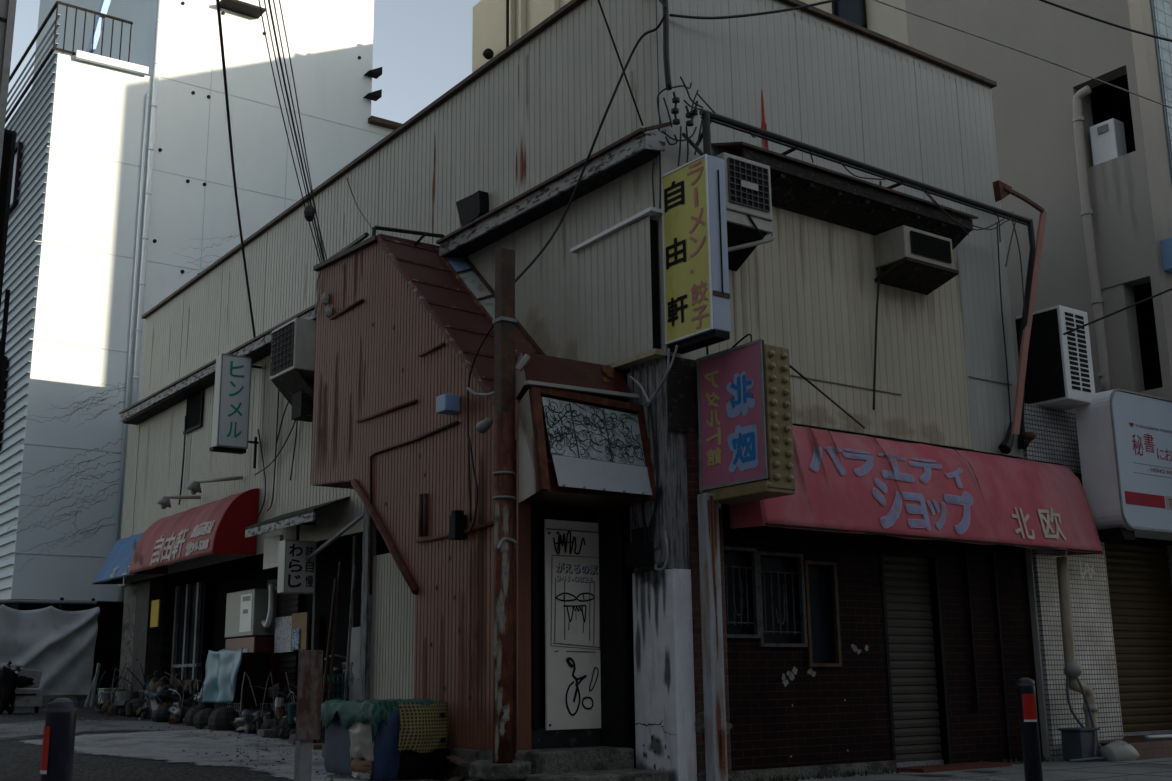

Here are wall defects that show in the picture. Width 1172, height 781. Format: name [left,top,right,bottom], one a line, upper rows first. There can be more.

corrosion [516,147,526,181]
corrosion [318,340,365,454]
crack [0,383,126,566]
damp [635,565,665,668]
peeling [782,666,816,687]
damp [650,738,661,754]